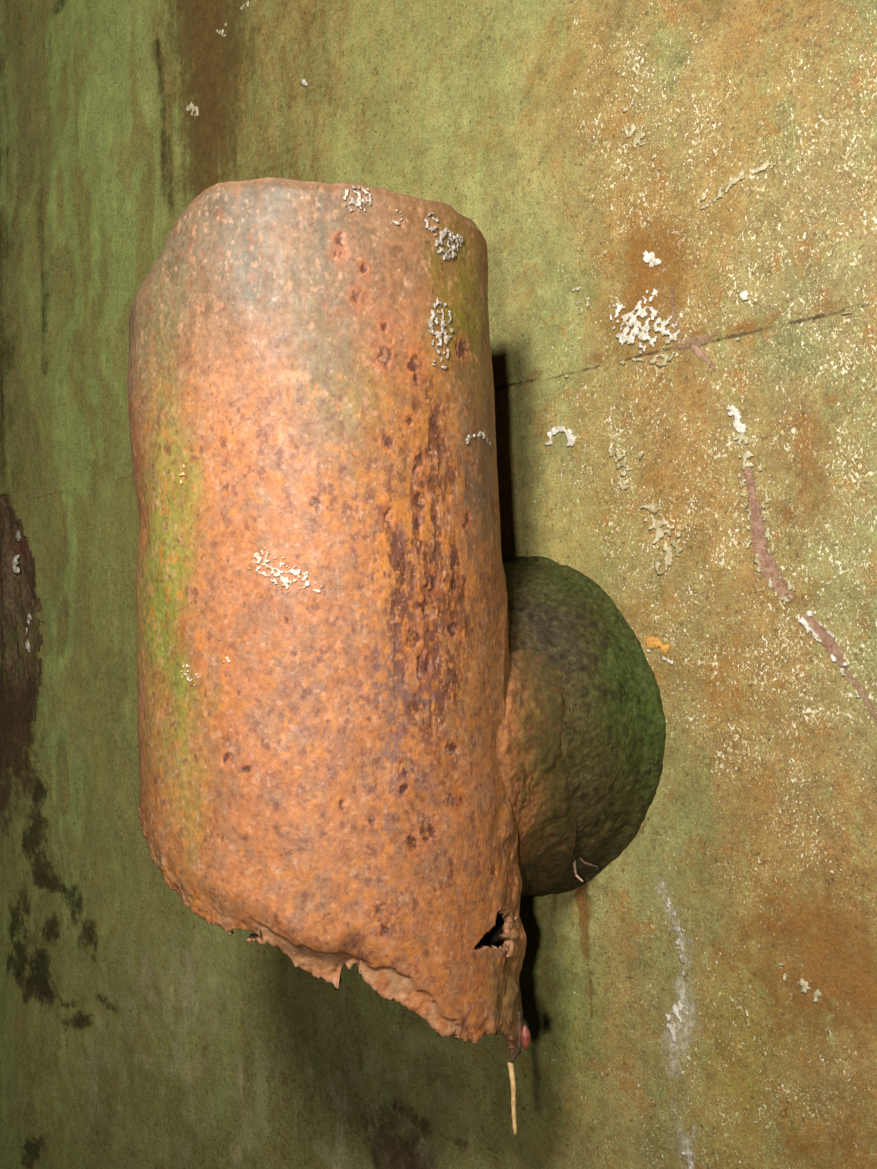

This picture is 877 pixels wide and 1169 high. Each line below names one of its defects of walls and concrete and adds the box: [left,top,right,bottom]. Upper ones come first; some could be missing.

crack [494,288,761,391]
crack [789,304,868,324]
spalling [0,494,97,1029]
water stain [657,882,694,1068]
water stain [679,1129,694,1169]